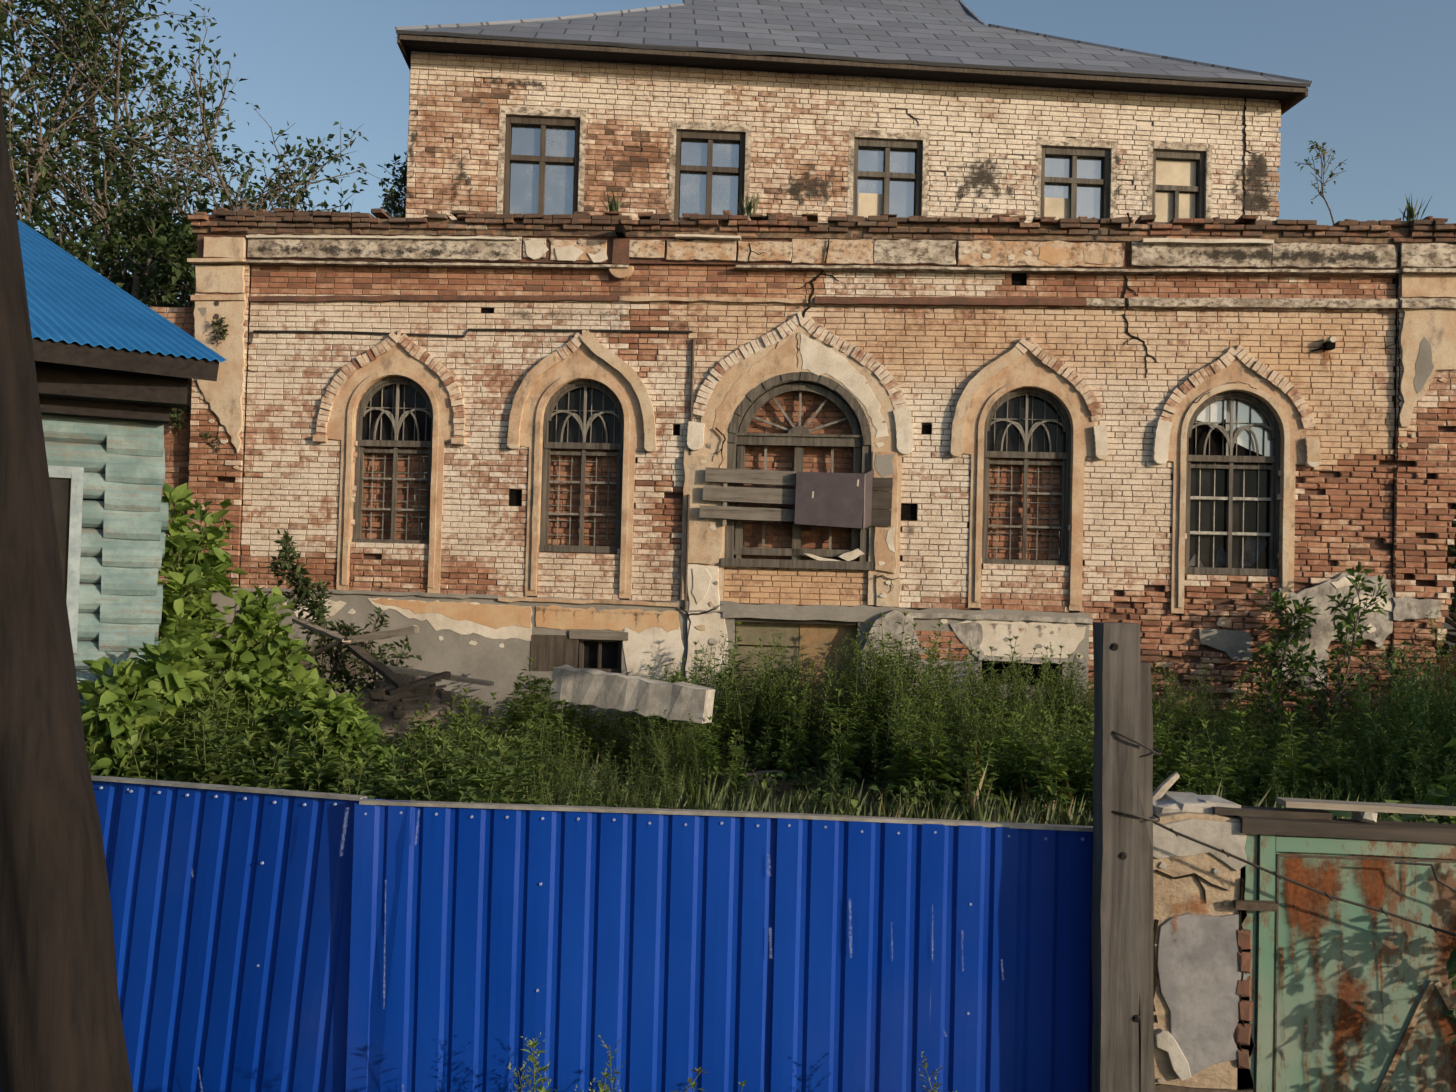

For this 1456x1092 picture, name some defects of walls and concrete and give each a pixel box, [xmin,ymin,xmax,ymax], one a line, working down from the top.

water stain [774,169,842,214]
water stain [955,134,1015,211]
water stain [1230,152,1275,220]
crack [775,239,839,368]
crack [1121,213,1158,378]
peeling [187,300,718,681]
spalling [1277,308,1456,593]
spalling [915,575,1443,762]
flaking render [1153,819,1247,874]
flaking render [1154,900,1253,1083]
rust [1280,852,1416,1092]
rust [1435,1008,1456,1087]